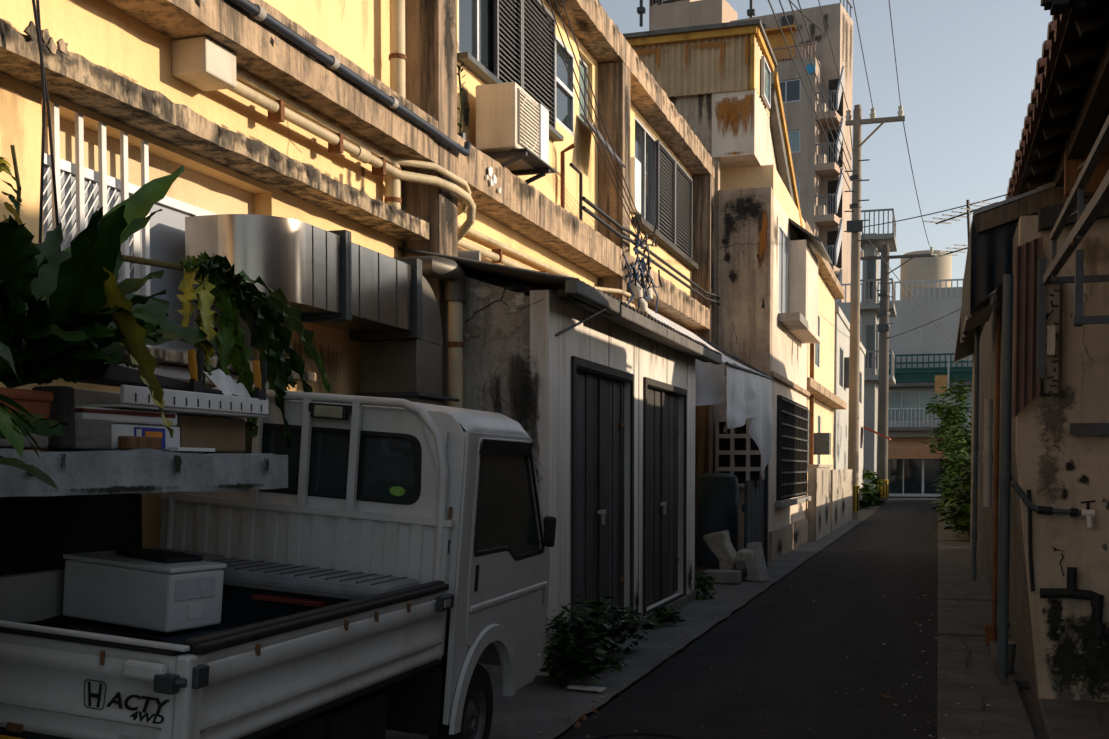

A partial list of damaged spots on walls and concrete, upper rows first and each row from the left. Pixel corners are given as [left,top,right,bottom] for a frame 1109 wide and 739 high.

leakage [0,19,18,42]
leakage [44,42,78,64]
leakage [95,66,164,105]
corrosion [715,94,754,134]
leakage [221,124,421,226]
leakage [661,195,778,316]
leakage [492,356,542,484]
leakage [1065,460,1089,484]
mould [1042,598,1109,701]